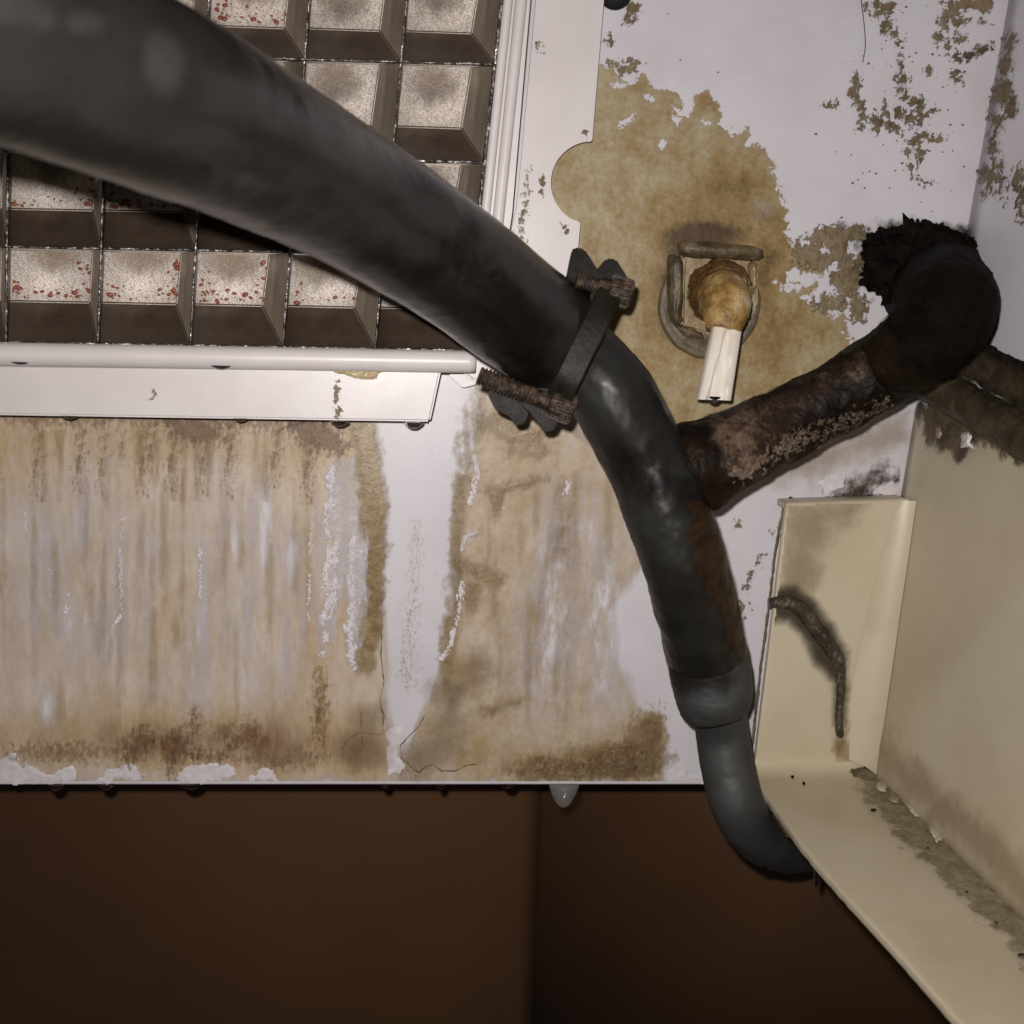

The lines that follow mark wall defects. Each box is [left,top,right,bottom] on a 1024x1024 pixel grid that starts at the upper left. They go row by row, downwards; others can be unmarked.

damp [551,0,1024,424]
damp [0,384,669,781]
damp [737,553,768,620]
crack [340,618,477,773]
mould [860,778,1024,958]